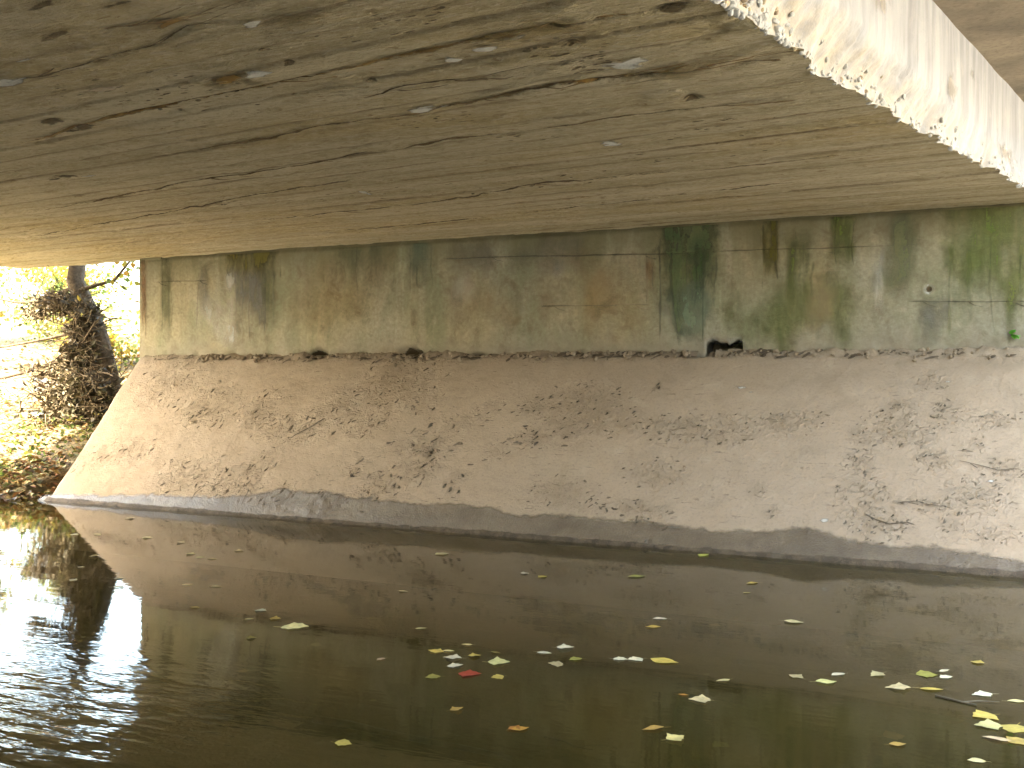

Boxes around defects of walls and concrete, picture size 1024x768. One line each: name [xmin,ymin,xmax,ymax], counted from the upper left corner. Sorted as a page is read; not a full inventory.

spalling [709,0,1024,188]
spalling [142,341,1024,379]